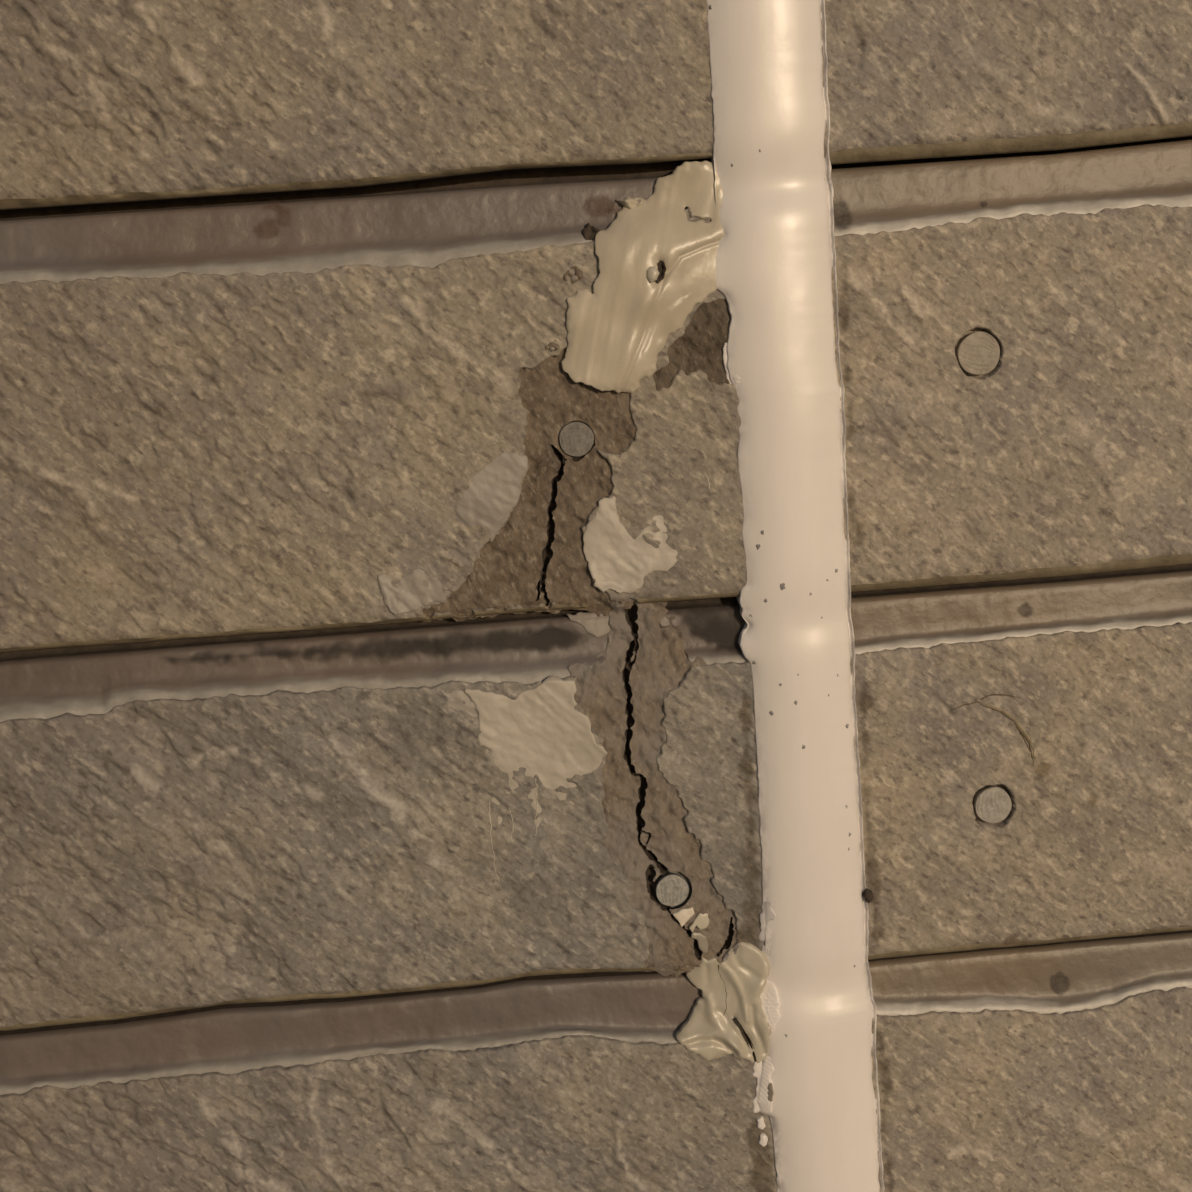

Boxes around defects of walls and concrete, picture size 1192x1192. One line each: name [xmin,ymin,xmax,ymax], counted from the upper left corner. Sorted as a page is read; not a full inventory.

spalling [377,348,737,978]
crack [536,443,595,604]
crack [622,604,757,1062]
spalling [653,300,731,391]